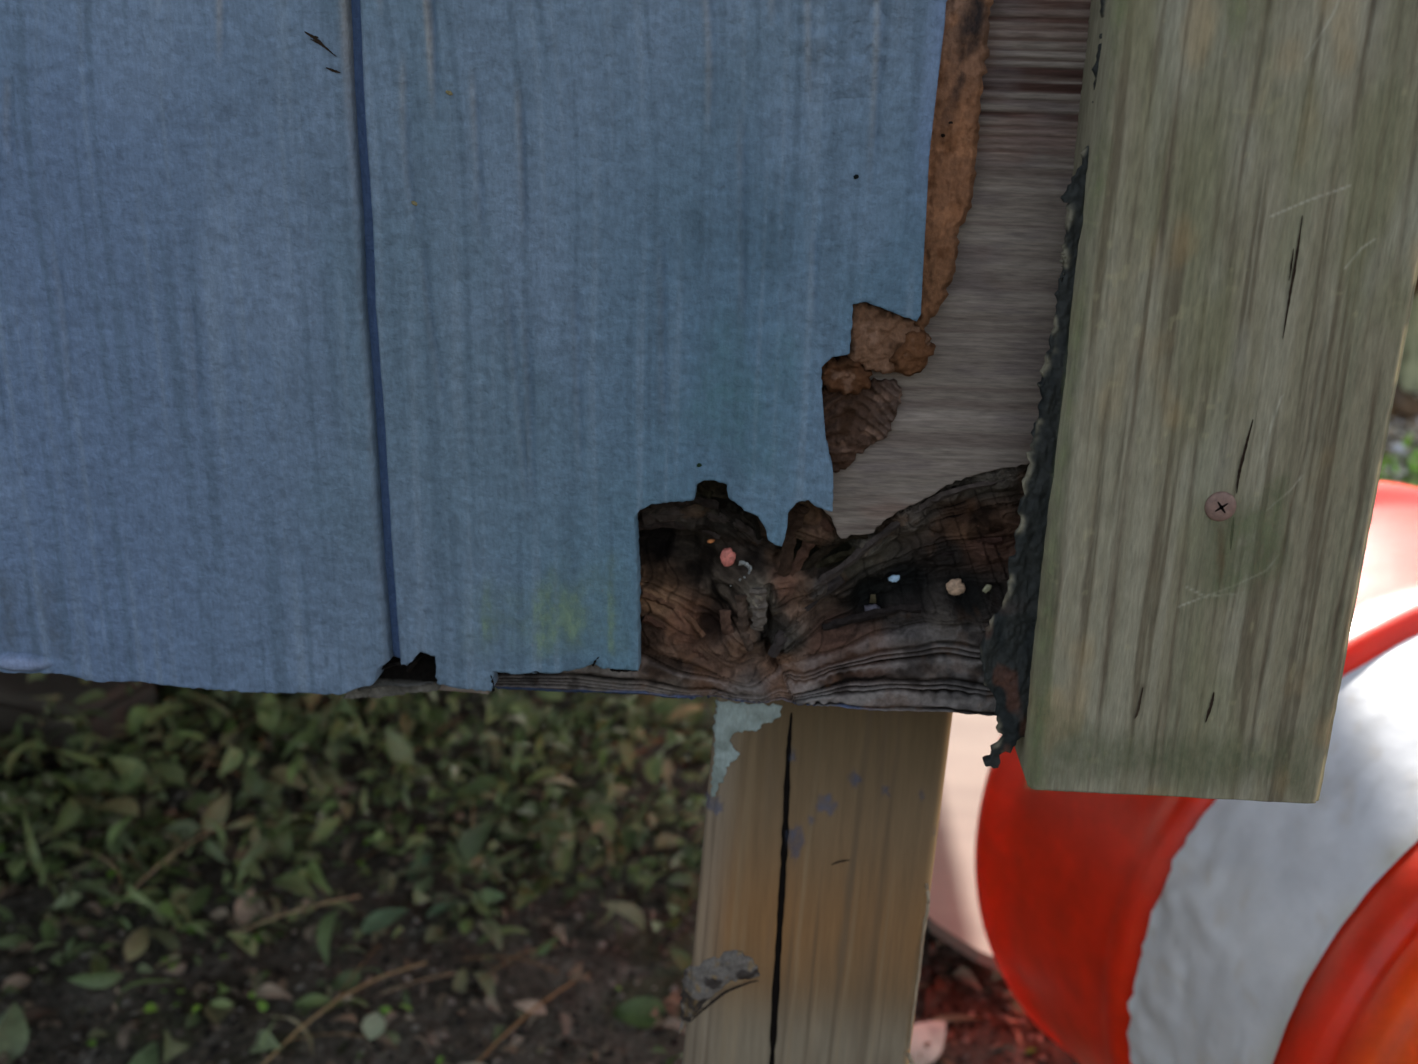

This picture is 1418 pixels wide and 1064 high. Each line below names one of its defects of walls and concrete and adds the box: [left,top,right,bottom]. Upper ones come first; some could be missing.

peeling [821,0,994,473]
crack [1282,216,1303,339]
crack [690,713,792,1064]